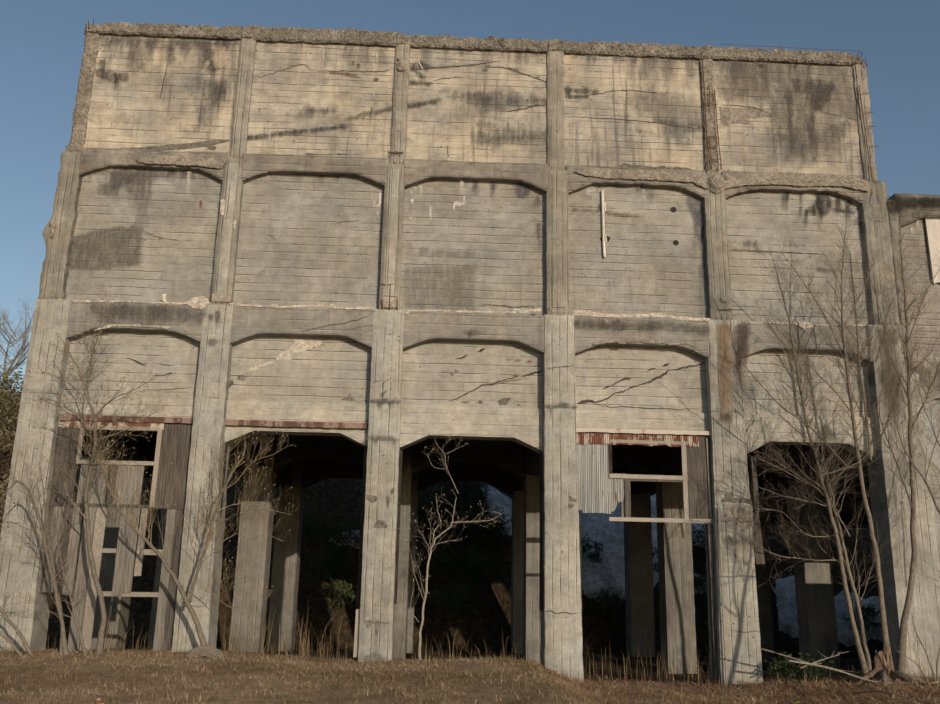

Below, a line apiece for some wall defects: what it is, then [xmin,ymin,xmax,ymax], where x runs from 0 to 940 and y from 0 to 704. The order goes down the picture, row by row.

water stain [100,35,231,72]
crack [418,61,696,129]
spalling [575,59,881,192]
water stain [722,61,857,154]
water stain [69,226,140,268]
spalling [57,293,211,309]
spalling [229,283,542,314]
crack [448,365,575,402]
crack [577,362,705,410]
rust [719,323,750,420]
rust [577,433,699,447]
spalling [722,493,754,532]